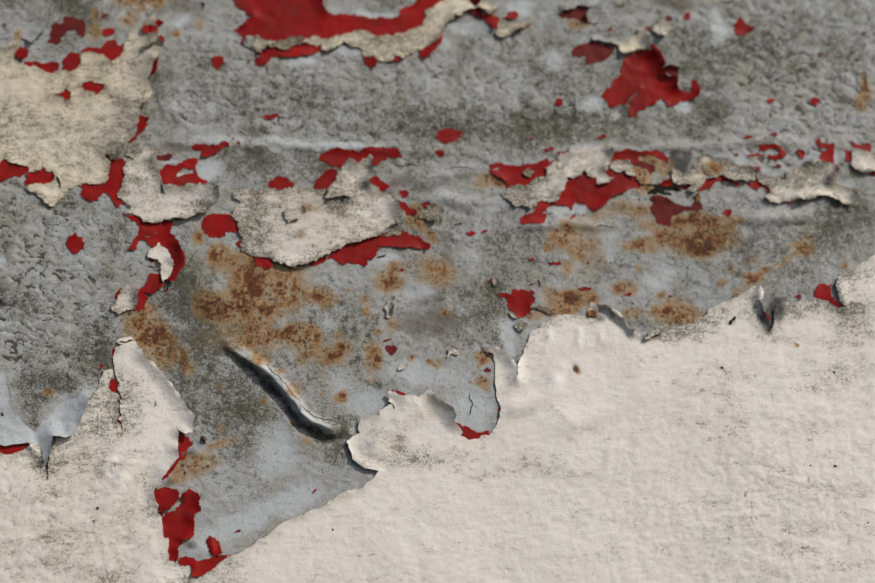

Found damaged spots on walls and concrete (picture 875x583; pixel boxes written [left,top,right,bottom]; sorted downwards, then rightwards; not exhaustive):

rust [80,0,181,48]
peeling [233,0,543,74]
peeling [531,0,703,126]
peeling [700,0,742,52]
peeling [0,15,445,314]
rust [517,148,821,334]
peeling [489,128,875,228]
rust [111,200,466,451]
peeling [0,275,875,583]